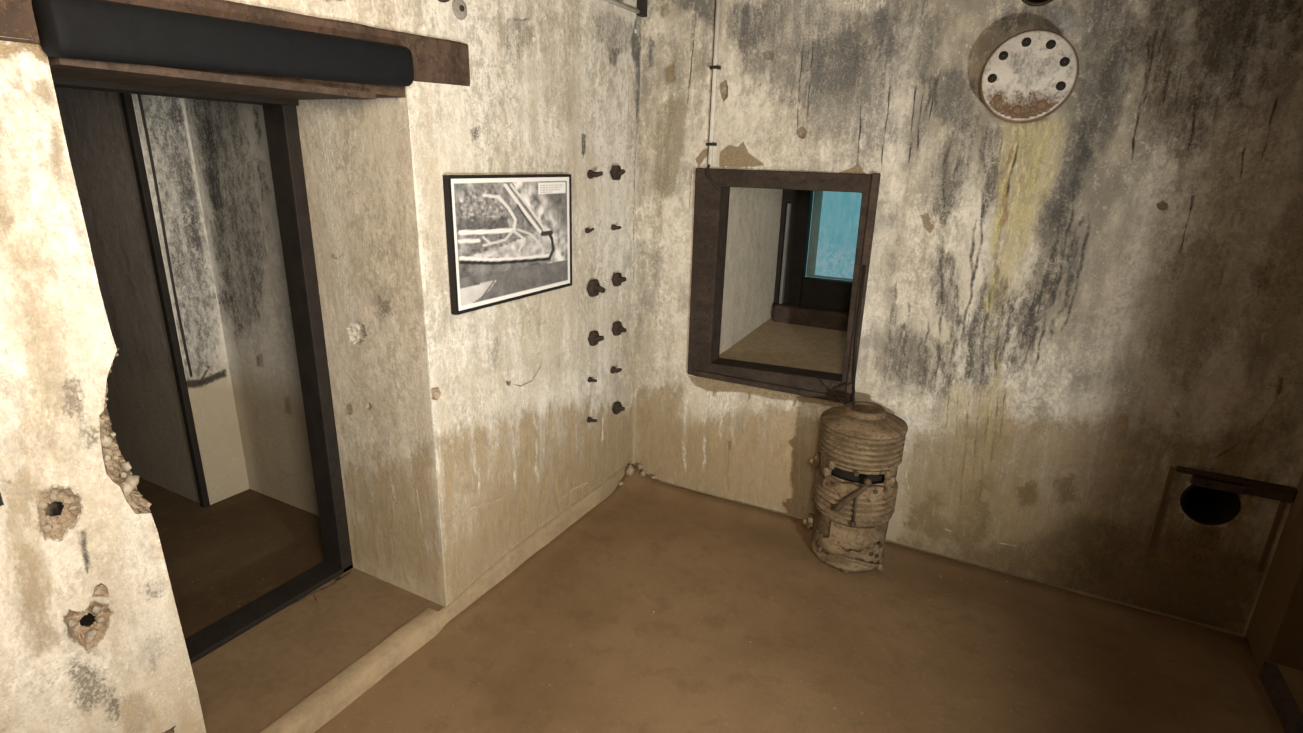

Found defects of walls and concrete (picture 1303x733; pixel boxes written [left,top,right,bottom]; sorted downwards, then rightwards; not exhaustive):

flaking render [0,36,49,63]
leakage [632,16,654,120]
leakage [683,0,715,28]
leakage [1188,0,1302,149]
corrosion [985,92,1064,314]
leakage [729,0,1270,632]
spalling [6,471,82,541]
spalling [63,347,151,514]
leakage [345,357,844,600]
spalling [63,583,113,653]